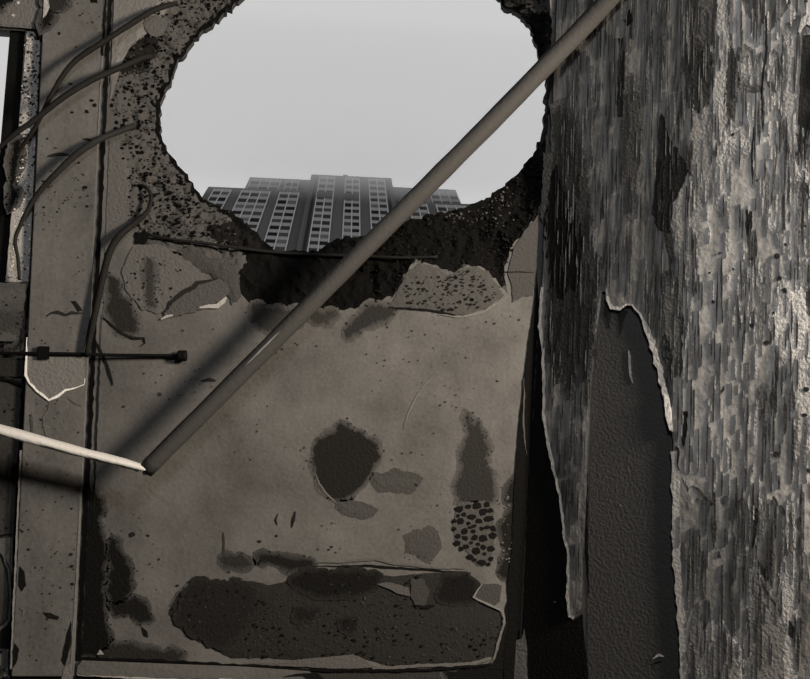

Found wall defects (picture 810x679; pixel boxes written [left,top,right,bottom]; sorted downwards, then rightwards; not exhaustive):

crack [48,150,70,158]
crack [83,0,113,293]
spalling [105,0,248,318]
crack [164,278,218,312]
damp [207,214,361,336]
damp [299,0,810,679]
crack [22,285,491,672]
damp [75,486,189,664]
damp [173,548,384,652]